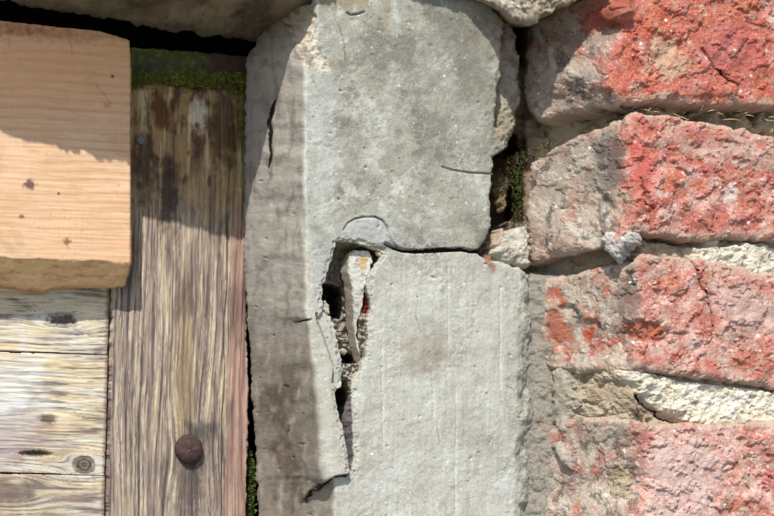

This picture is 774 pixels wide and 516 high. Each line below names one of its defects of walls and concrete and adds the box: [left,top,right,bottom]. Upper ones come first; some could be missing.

crack [705,54,741,98]
crack [267,99,275,167]
crack [343,216,482,254]
spalling [336,250,382,378]
crack [634,394,673,423]